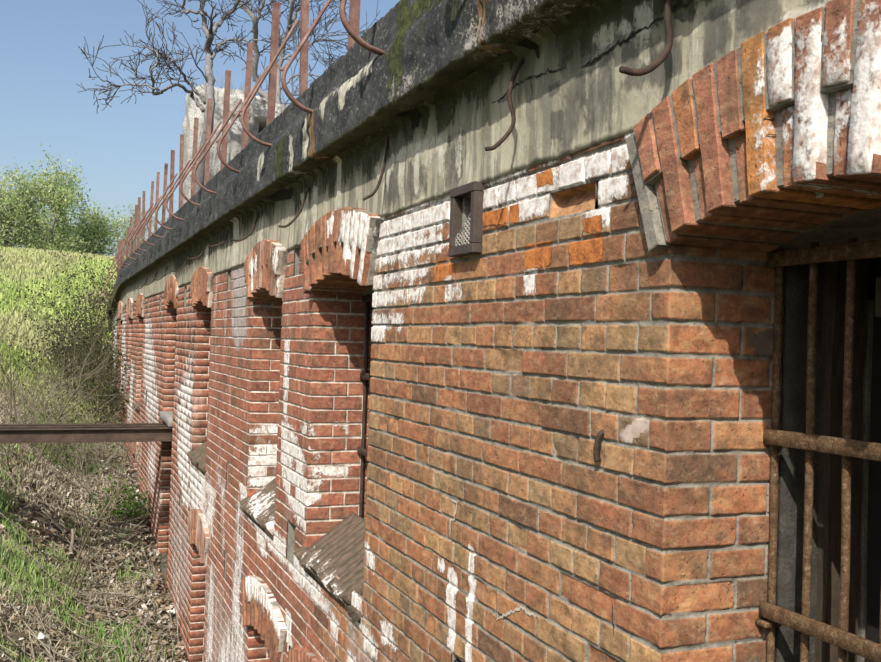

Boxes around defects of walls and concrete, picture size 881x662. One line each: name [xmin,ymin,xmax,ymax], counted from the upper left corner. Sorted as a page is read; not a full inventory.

damp [289,51,517,239]
crack [492,0,692,103]